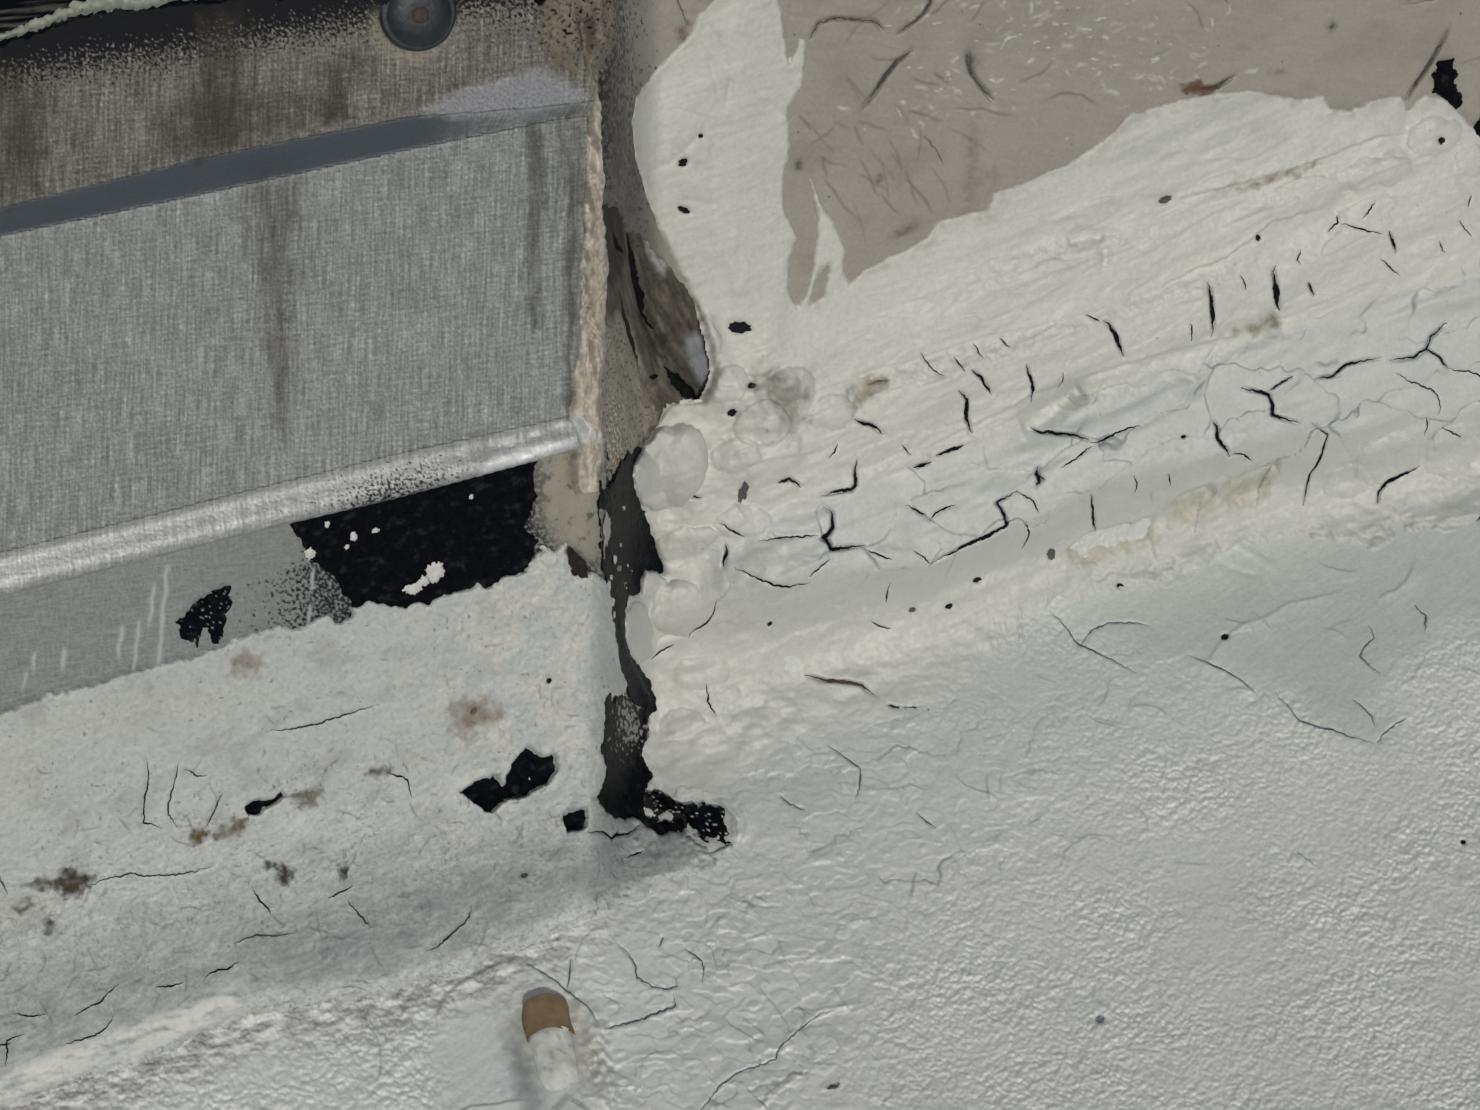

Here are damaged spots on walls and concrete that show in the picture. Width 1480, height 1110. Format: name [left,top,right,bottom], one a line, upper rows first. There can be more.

peeling [1406,32,1463,110]
crack [1190,204,1399,341]
crack [1085,314,1124,357]
crack [693,338,1137,629]
crack [1213,420,1251,460]
crack [1241,323,1480,504]
peeling [290,461,538,608]
peeling [175,585,233,648]
peeling [597,446,731,846]
peeling [461,748,555,812]
peeling [563,810,586,831]
crack [521,938,705,1029]